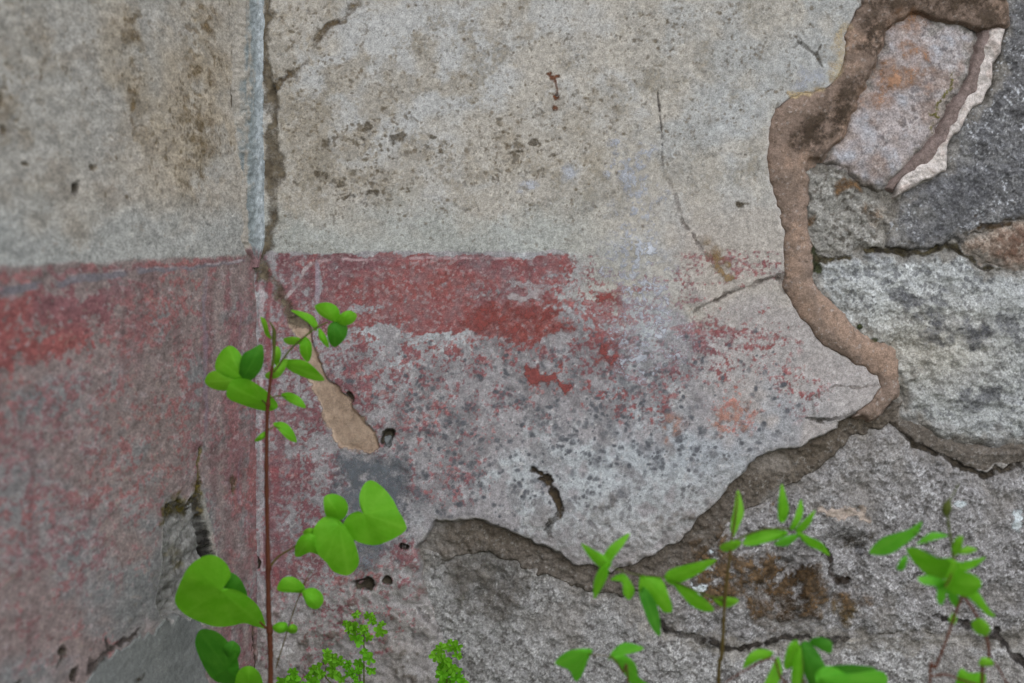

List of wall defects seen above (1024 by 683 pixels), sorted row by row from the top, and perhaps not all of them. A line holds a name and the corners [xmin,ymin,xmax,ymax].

crack [314,1,360,44]
rust [547,72,560,111]
crack [255,0,310,329]
peeling [464,300,576,343]
spalling [288,319,379,454]
peeling [524,365,572,394]
peeling [595,340,619,365]
crack [893,425,1022,480]
crack [192,446,211,557]
crack [530,467,564,527]
spalling [154,502,208,625]